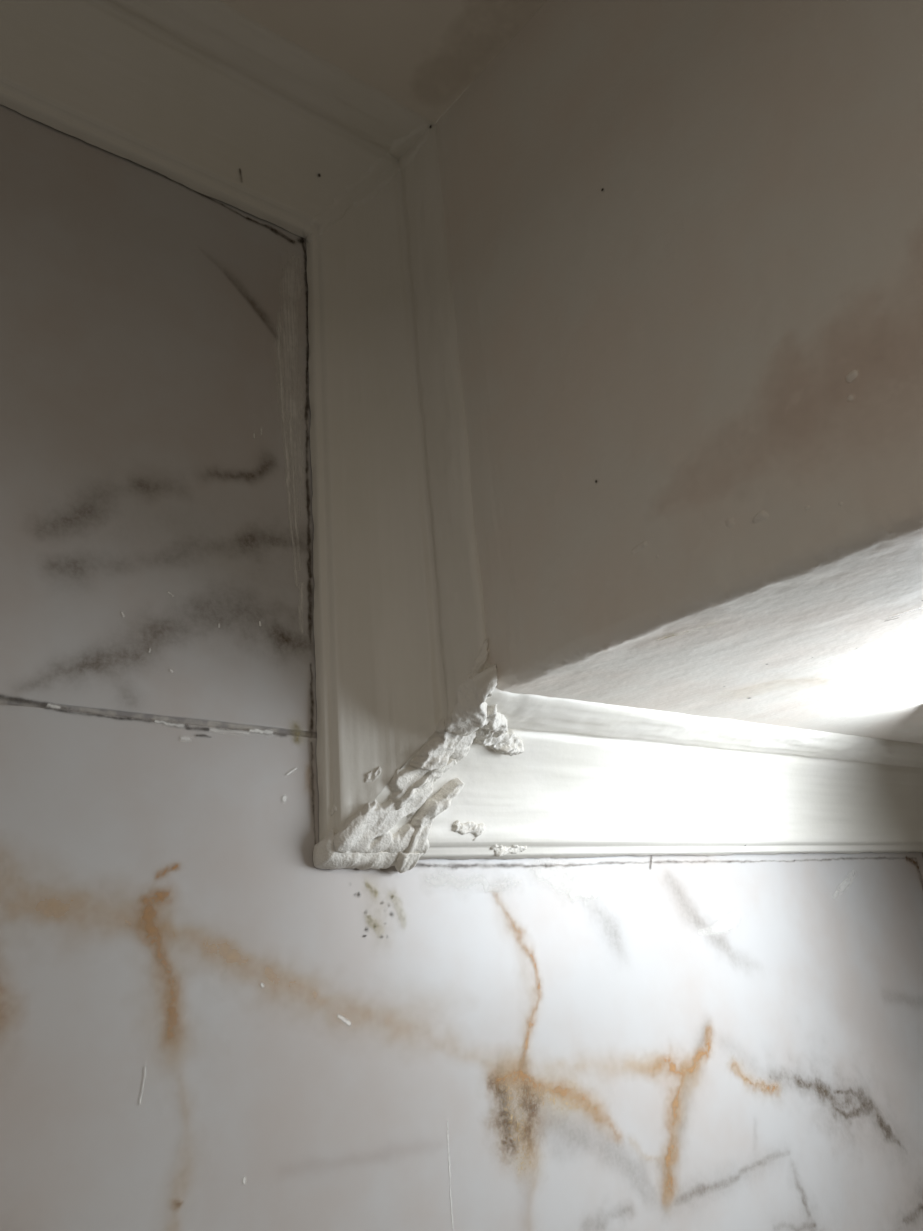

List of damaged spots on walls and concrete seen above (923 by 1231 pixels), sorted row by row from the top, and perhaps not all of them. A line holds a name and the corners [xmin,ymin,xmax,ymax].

peeling [475,704,524,756]
peeling [490,844,527,857]